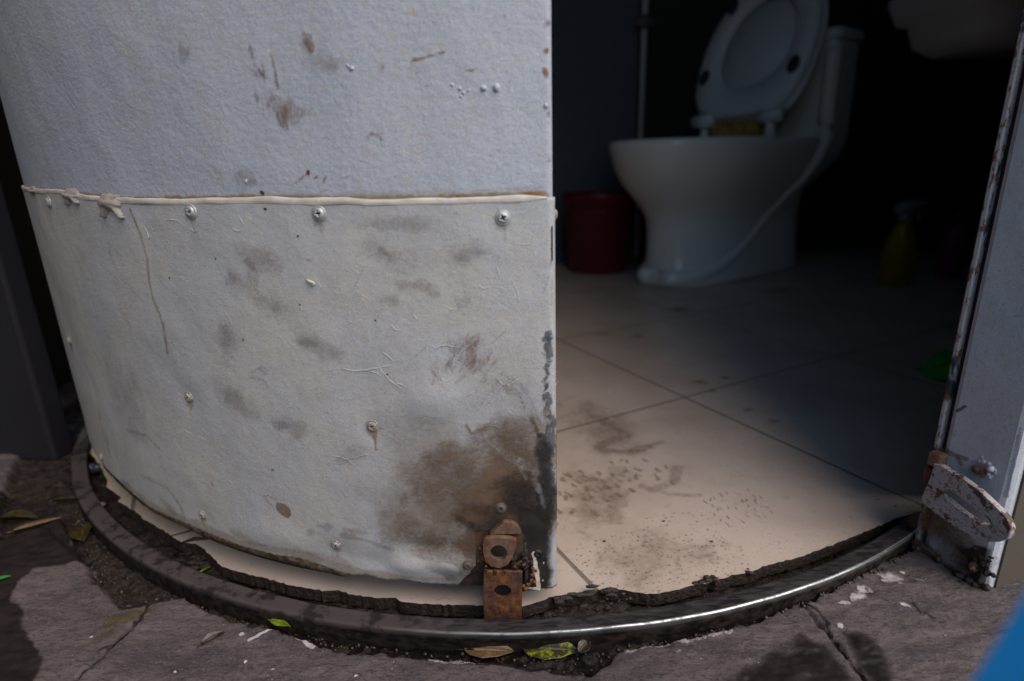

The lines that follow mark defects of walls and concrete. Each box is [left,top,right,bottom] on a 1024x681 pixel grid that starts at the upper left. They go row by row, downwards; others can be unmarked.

leakage [531,418,556,521]
rust [942,449,986,476]